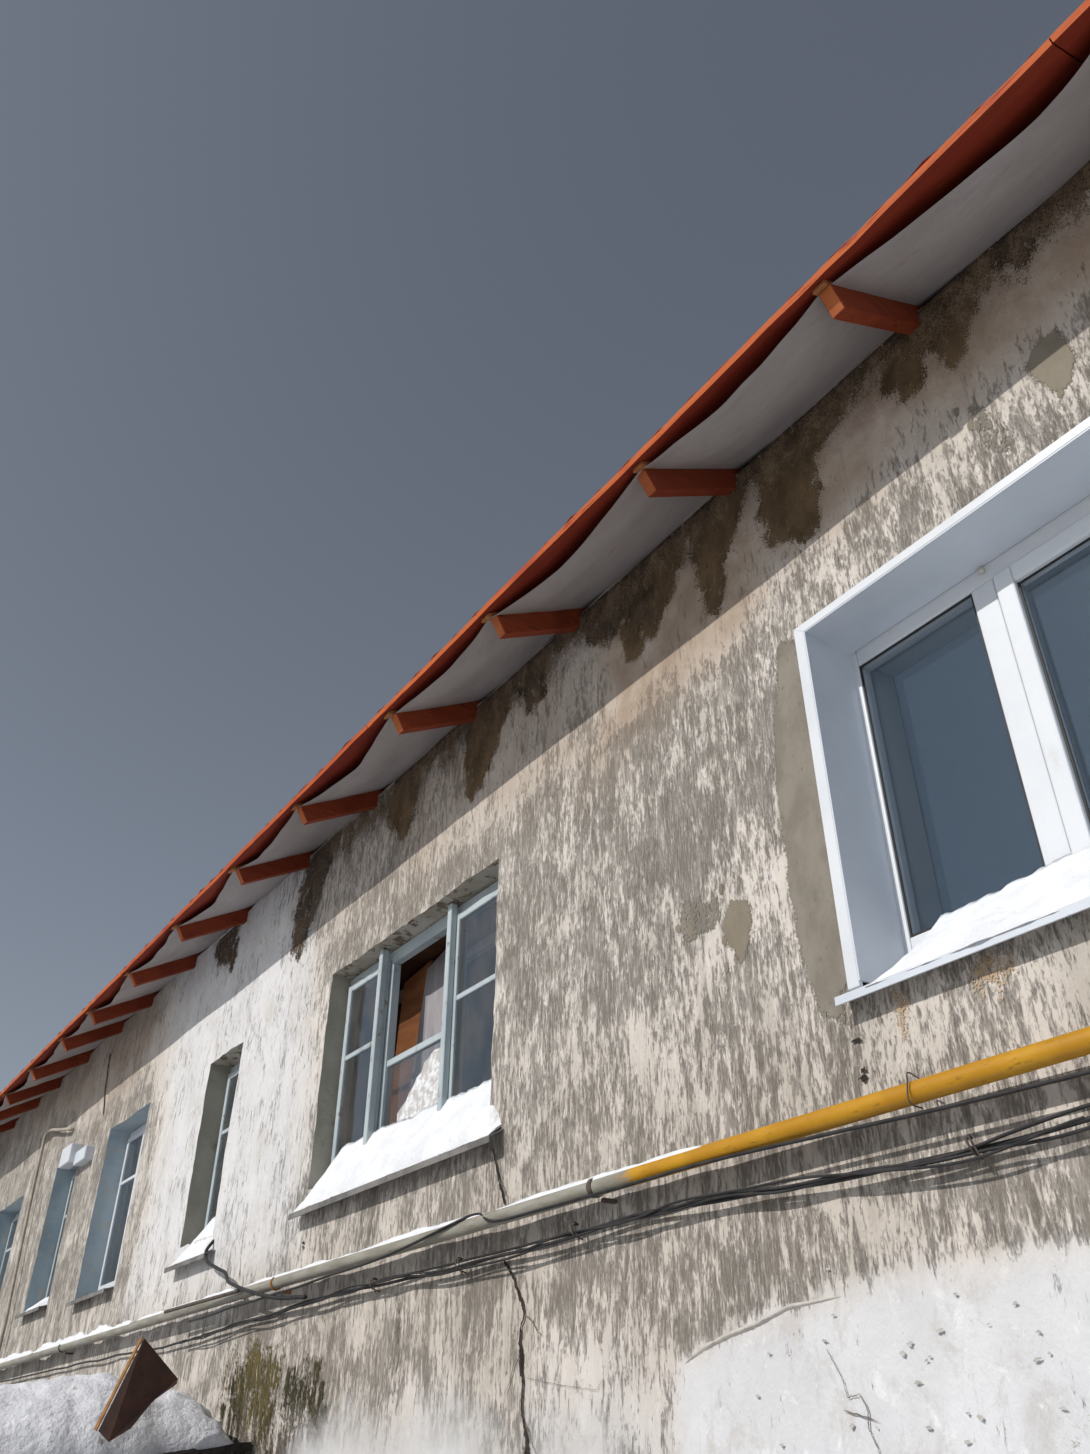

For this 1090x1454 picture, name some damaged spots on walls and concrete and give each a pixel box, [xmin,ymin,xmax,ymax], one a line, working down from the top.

leakage [289,160,1090,963]
leakage [218,1356,330,1454]
crack [504,1261,602,1454]